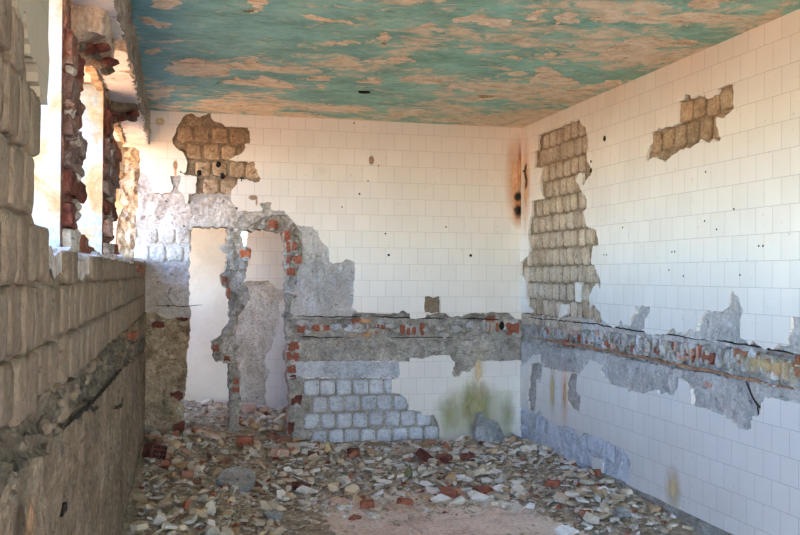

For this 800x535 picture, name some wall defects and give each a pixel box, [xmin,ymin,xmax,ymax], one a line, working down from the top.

peeling [649,85,734,160]
corrosion [513,154,527,219]
peeling [0,0,480,535]
peeling [485,121,800,485]
corrosion [529,337,799,391]
crack [746,381,761,415]